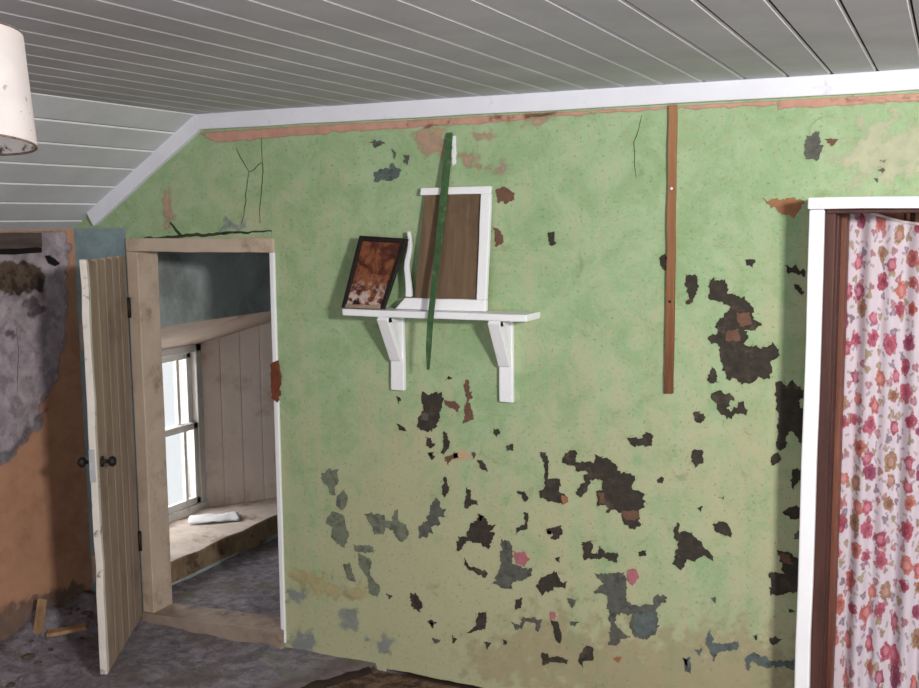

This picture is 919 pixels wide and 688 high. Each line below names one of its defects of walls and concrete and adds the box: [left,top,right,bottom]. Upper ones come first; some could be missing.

crack [144,138,272,238]
peeling [200,93,919,183]
flaking render [0,231,72,455]
peeling [684,274,804,468]
peeling [417,379,488,471]
peeling [321,468,393,600]
peeling [364,477,449,542]
peeling [456,487,576,608]
peeling [539,450,645,530]
peeling [581,541,667,663]
peeling [672,522,713,570]
peeling [768,550,798,596]